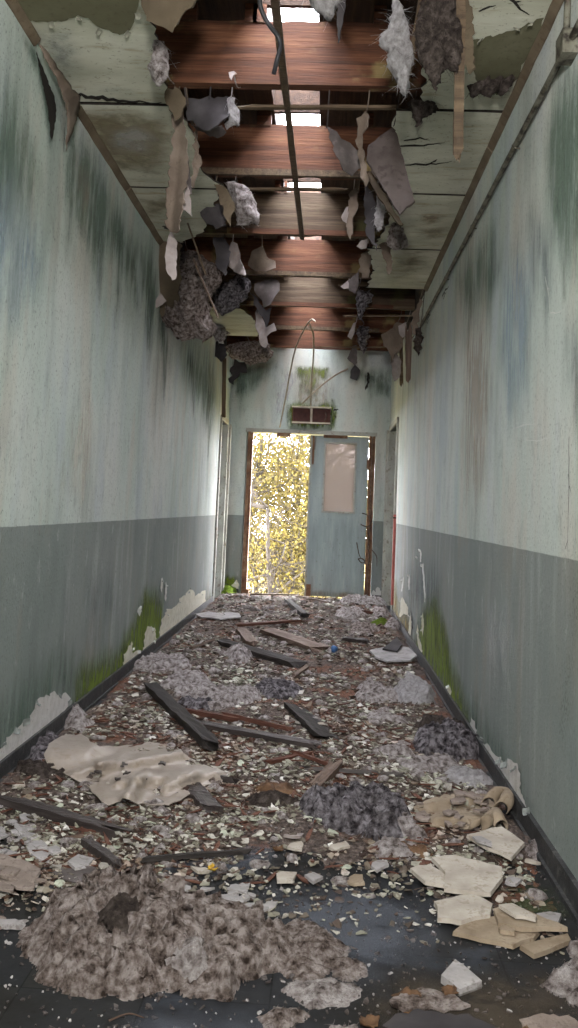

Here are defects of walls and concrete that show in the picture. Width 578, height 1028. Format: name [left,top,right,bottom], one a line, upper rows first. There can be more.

crack [479,0,529,15]
leakage [550,91,578,241]
leakage [71,139,165,341]
flaking render [123,578,206,665]
peeling [0,691,72,760]
peeling [470,718,530,816]